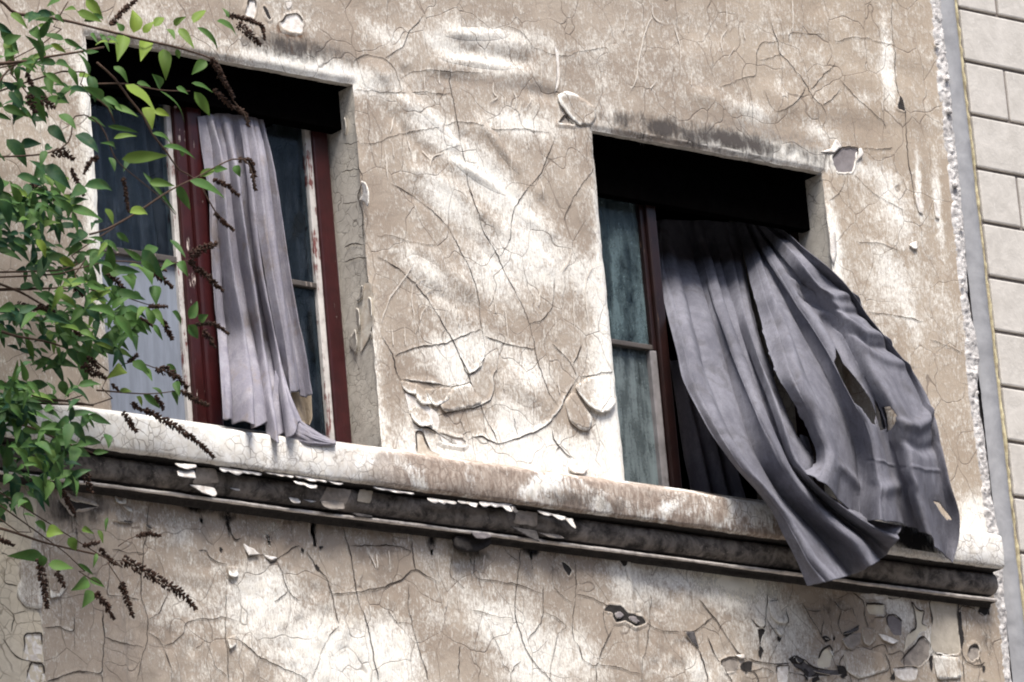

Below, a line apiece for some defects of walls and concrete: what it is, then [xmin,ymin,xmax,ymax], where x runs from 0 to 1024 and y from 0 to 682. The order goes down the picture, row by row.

leakage [617,114,791,156]
crack [720,0,916,211]
crack [343,5,693,458]
crack [858,240,898,250]
spalling [915,0,999,535]
crack [869,310,962,353]
spalling [175,463,414,510]
peeling [426,498,576,542]
spalling [0,488,68,682]
crack [0,506,985,682]
spalling [603,601,648,631]
spalling [774,593,985,682]